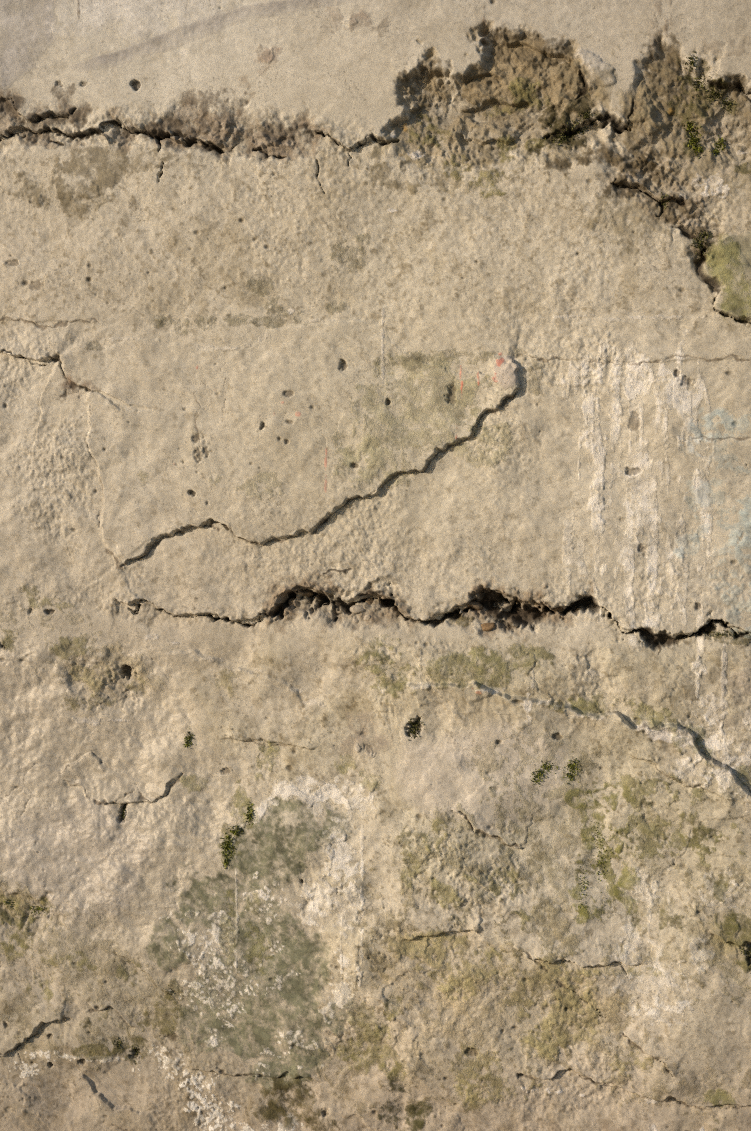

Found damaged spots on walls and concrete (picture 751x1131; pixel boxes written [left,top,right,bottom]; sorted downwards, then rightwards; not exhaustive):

crack [0,96,287,183]
crack [315,131,400,194]
spalling [381,20,751,280]
crack [611,179,751,325]
crack [0,316,751,571]
crack [131,567,750,656]
water stain [159,772,378,1048]
water stain [8,1044,304,1131]
water stain [254,1025,324,1081]
crack [517,951,751,1111]